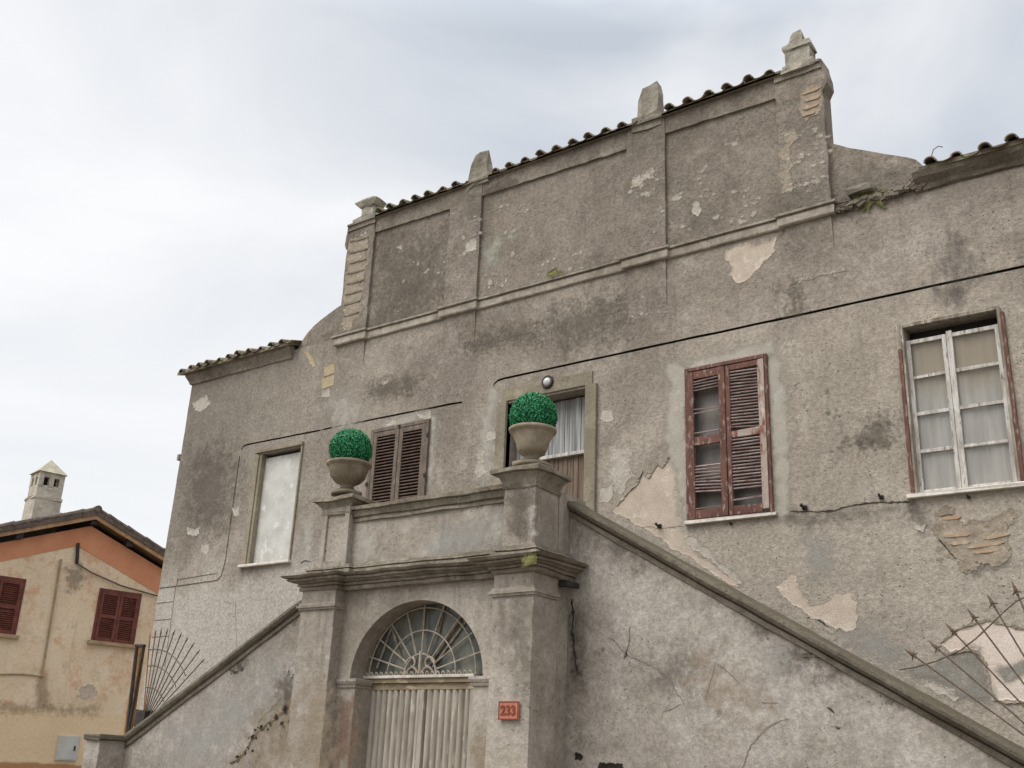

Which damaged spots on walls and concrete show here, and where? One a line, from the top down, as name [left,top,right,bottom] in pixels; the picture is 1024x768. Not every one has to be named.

flaking render [777,81,833,193]
peeling [628,168,664,198]
peeling [724,237,777,283]
flaking render [192,395,211,412]
peeling [598,443,743,587]
crack [790,501,911,513]
flaking render [912,505,1018,574]
peeling [775,573,859,632]
crack [570,600,579,674]
peeling [940,619,1024,704]
crack [230,697,290,764]